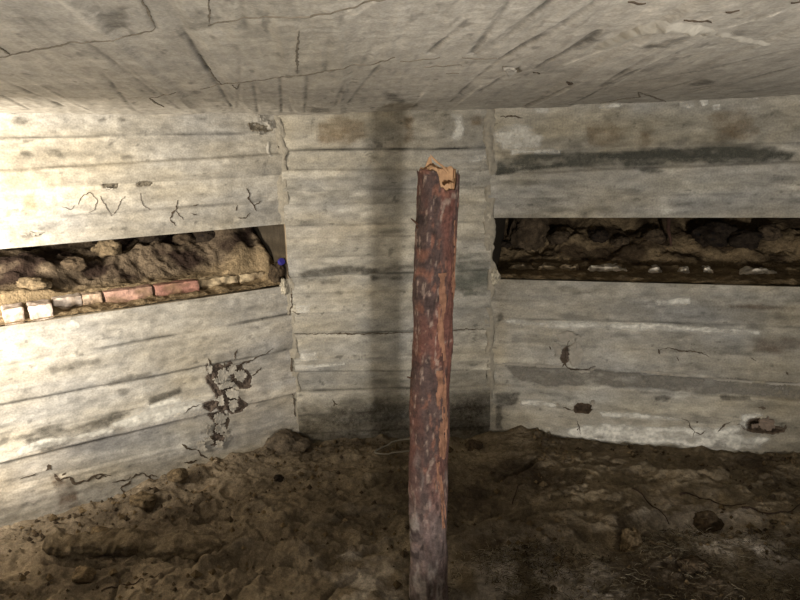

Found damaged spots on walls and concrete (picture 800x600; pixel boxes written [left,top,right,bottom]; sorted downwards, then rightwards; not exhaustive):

crack [0,0,156,58]
crack [684,10,740,23]
crack [200,0,497,90]
spalling [248,114,276,135]
leakage [496,126,793,175]
crack [63,192,150,216]
crack [170,200,198,226]
peeling [502,331,800,398]
spalling [185,349,272,452]
spalling [556,400,595,414]
spalling [736,406,787,435]
crack [21,464,157,493]